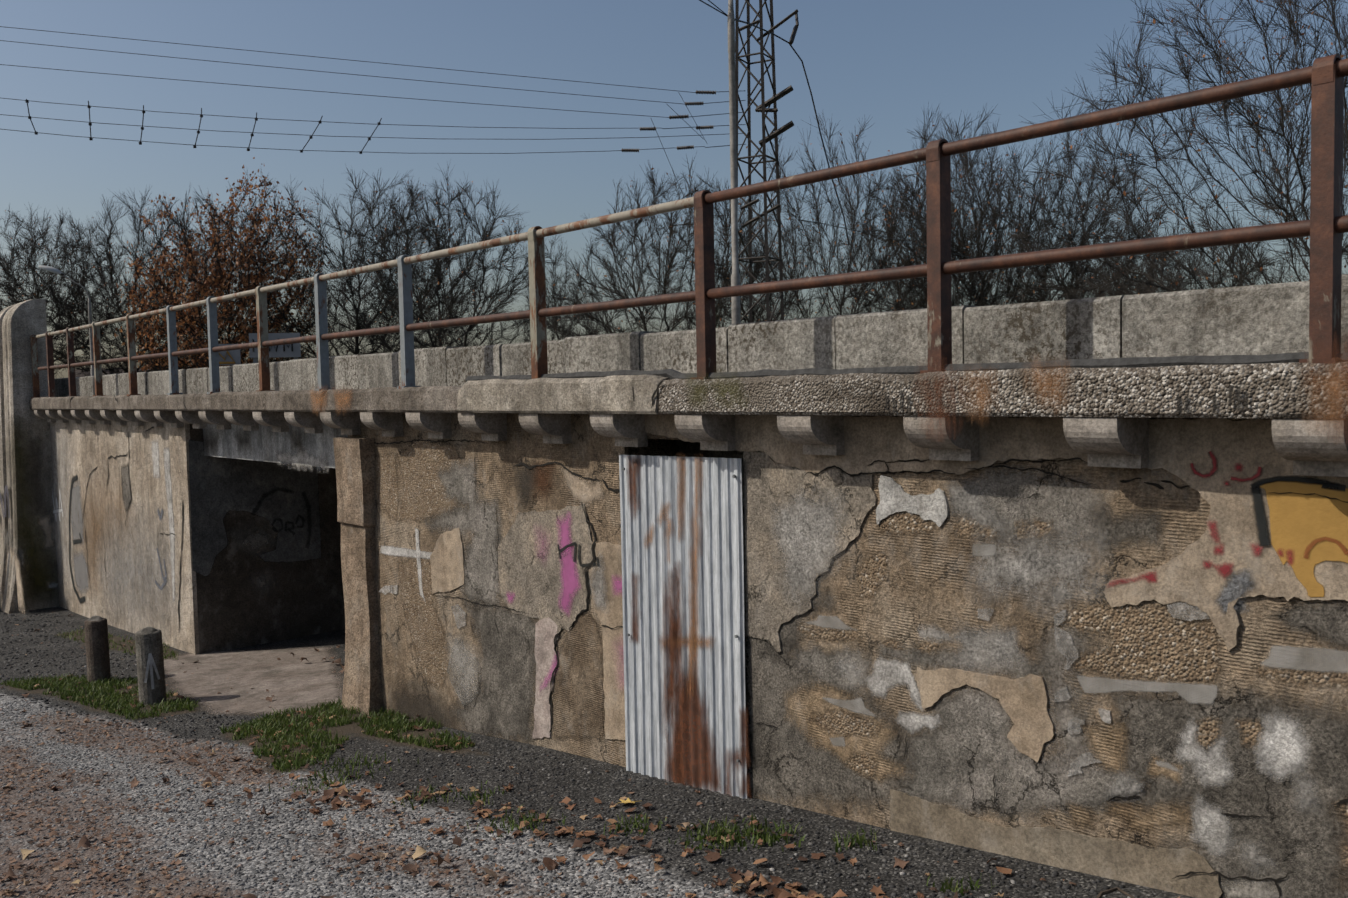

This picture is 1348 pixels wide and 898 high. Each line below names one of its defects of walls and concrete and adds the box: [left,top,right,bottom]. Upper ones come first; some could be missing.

crack [374,439,499,564]
corrosion [628,459,640,509]
flaking render [876,475,999,539]
crack [805,457,1087,485]
crack [1120,477,1190,489]
spalling [379,528,465,689]
crack [439,595,525,634]
flaking render [497,469,625,740]
crack [513,462,623,733]
corrosion [648,458,749,795]
spalling [1054,602,1222,684]
spalling [787,684,902,781]